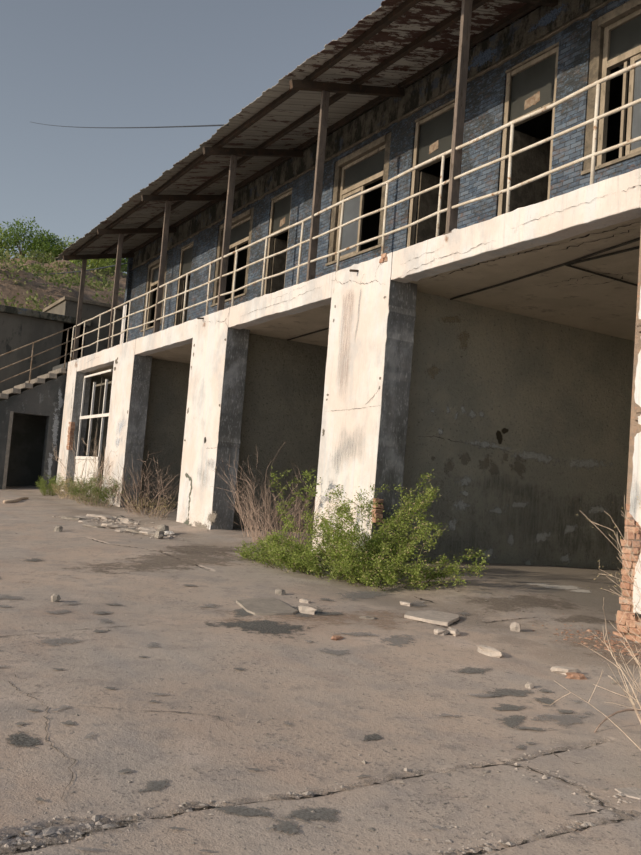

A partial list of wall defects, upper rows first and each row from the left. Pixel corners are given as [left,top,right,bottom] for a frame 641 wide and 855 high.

crack [333,222,638,284]
flaking render [613,504,641,643]